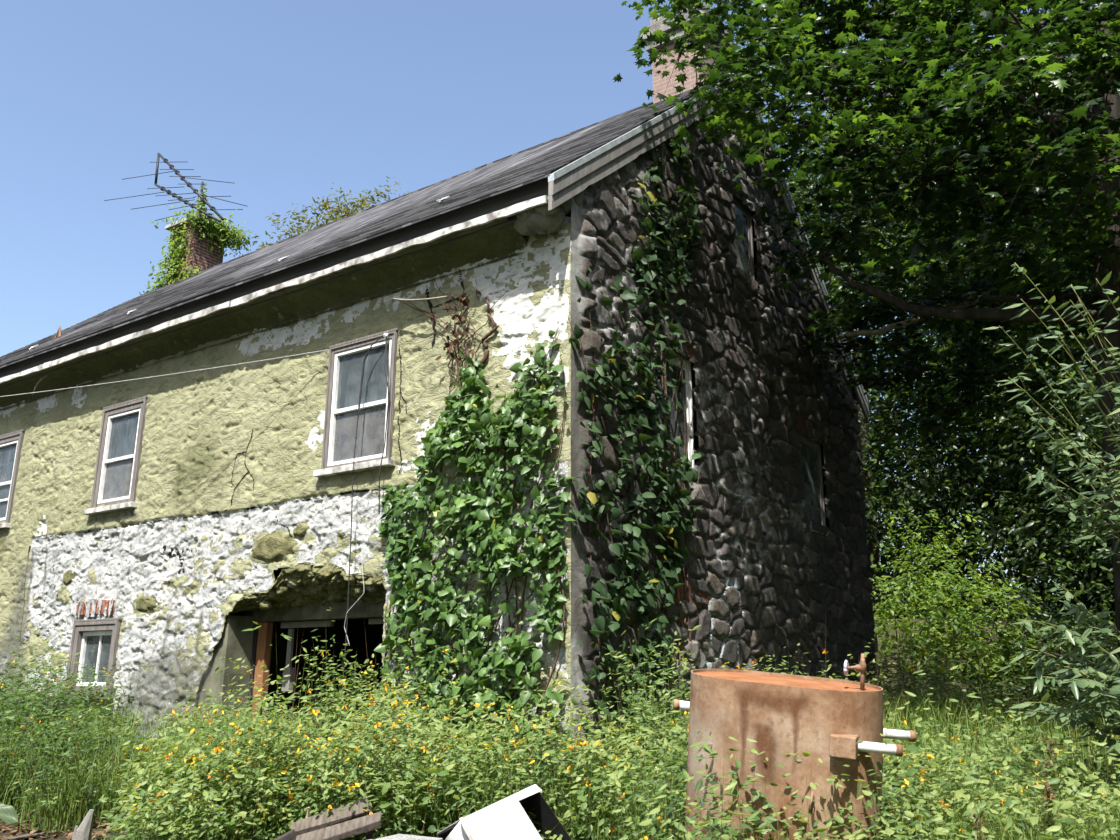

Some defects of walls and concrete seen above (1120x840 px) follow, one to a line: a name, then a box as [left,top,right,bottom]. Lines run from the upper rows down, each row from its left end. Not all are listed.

peeling [235,191,584,401]
crack [18,348,407,664]
peeling [0,410,569,764]